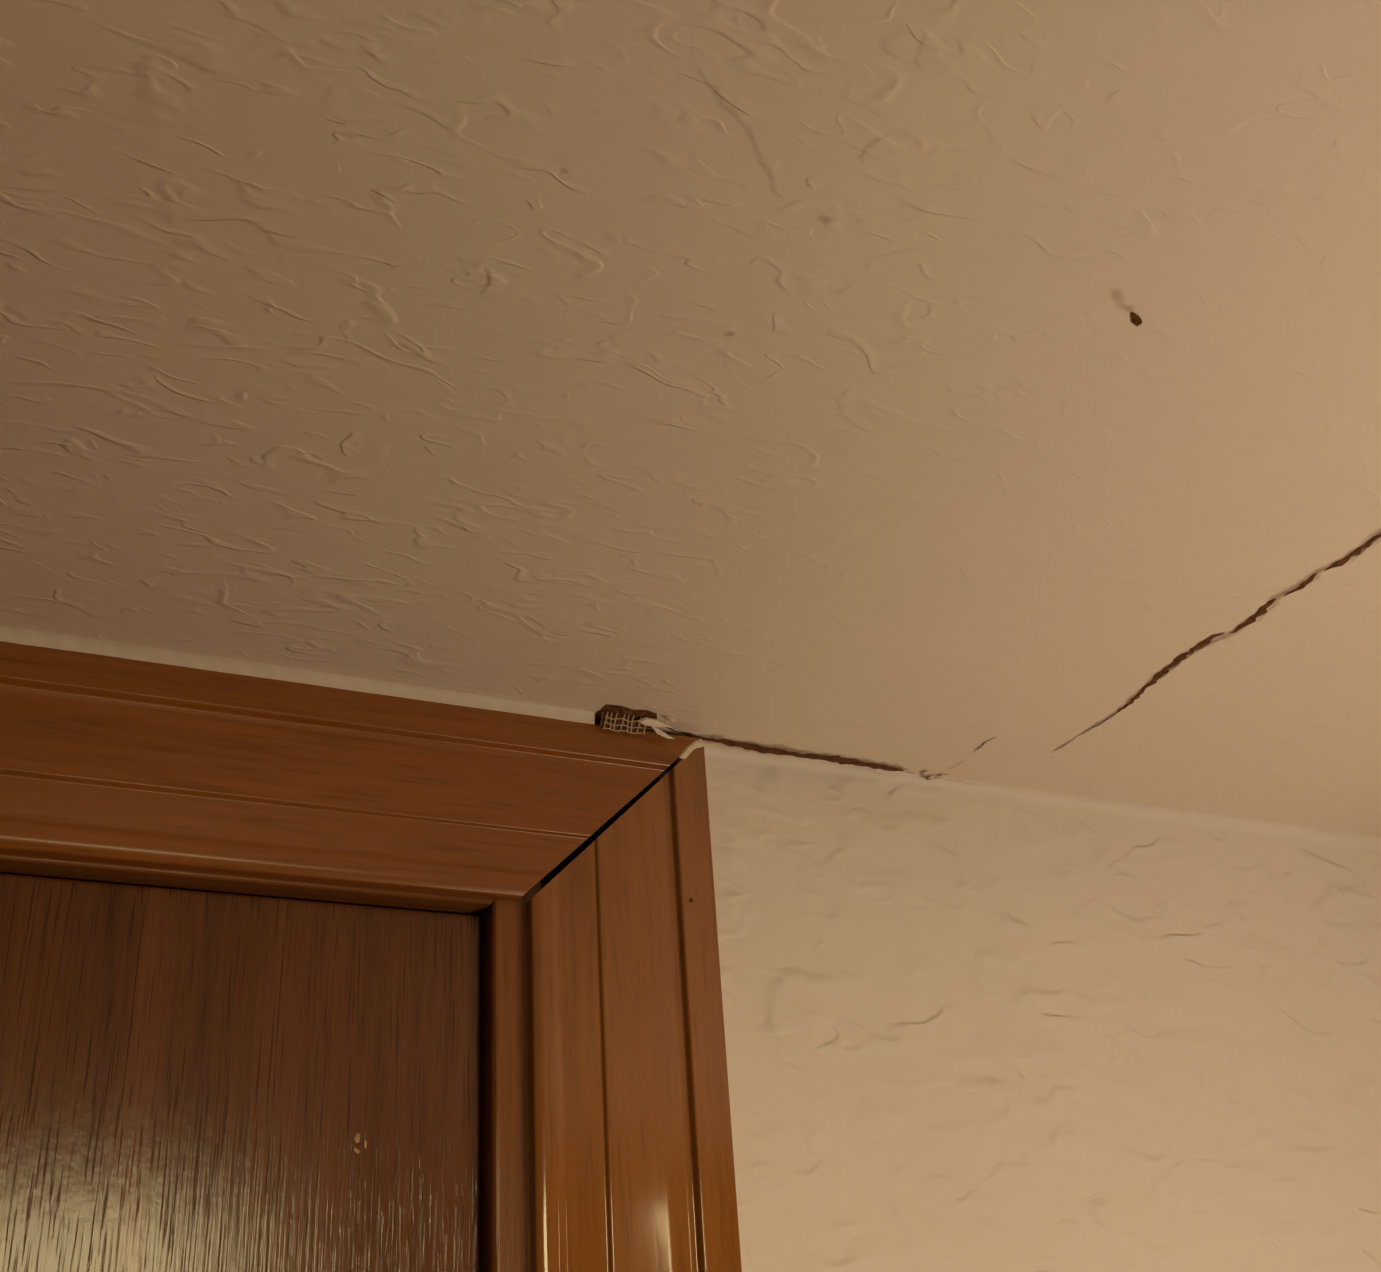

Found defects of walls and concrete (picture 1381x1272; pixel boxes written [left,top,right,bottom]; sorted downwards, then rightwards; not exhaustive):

crack [1057,534,1381,750]
spalling [600,705,676,739]
crack [666,727,914,774]